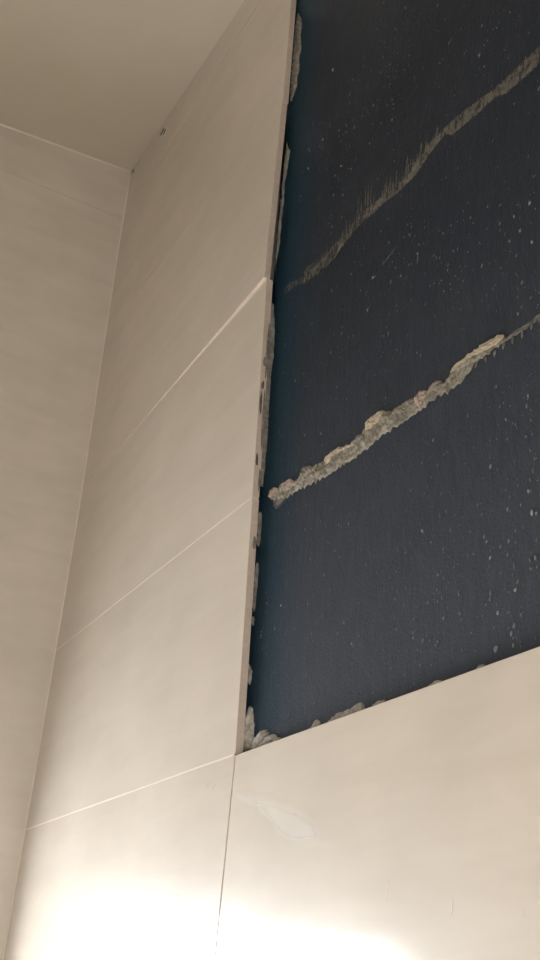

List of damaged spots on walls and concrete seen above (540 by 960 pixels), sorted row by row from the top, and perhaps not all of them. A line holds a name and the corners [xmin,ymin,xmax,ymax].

peeling [243,0,540,752]